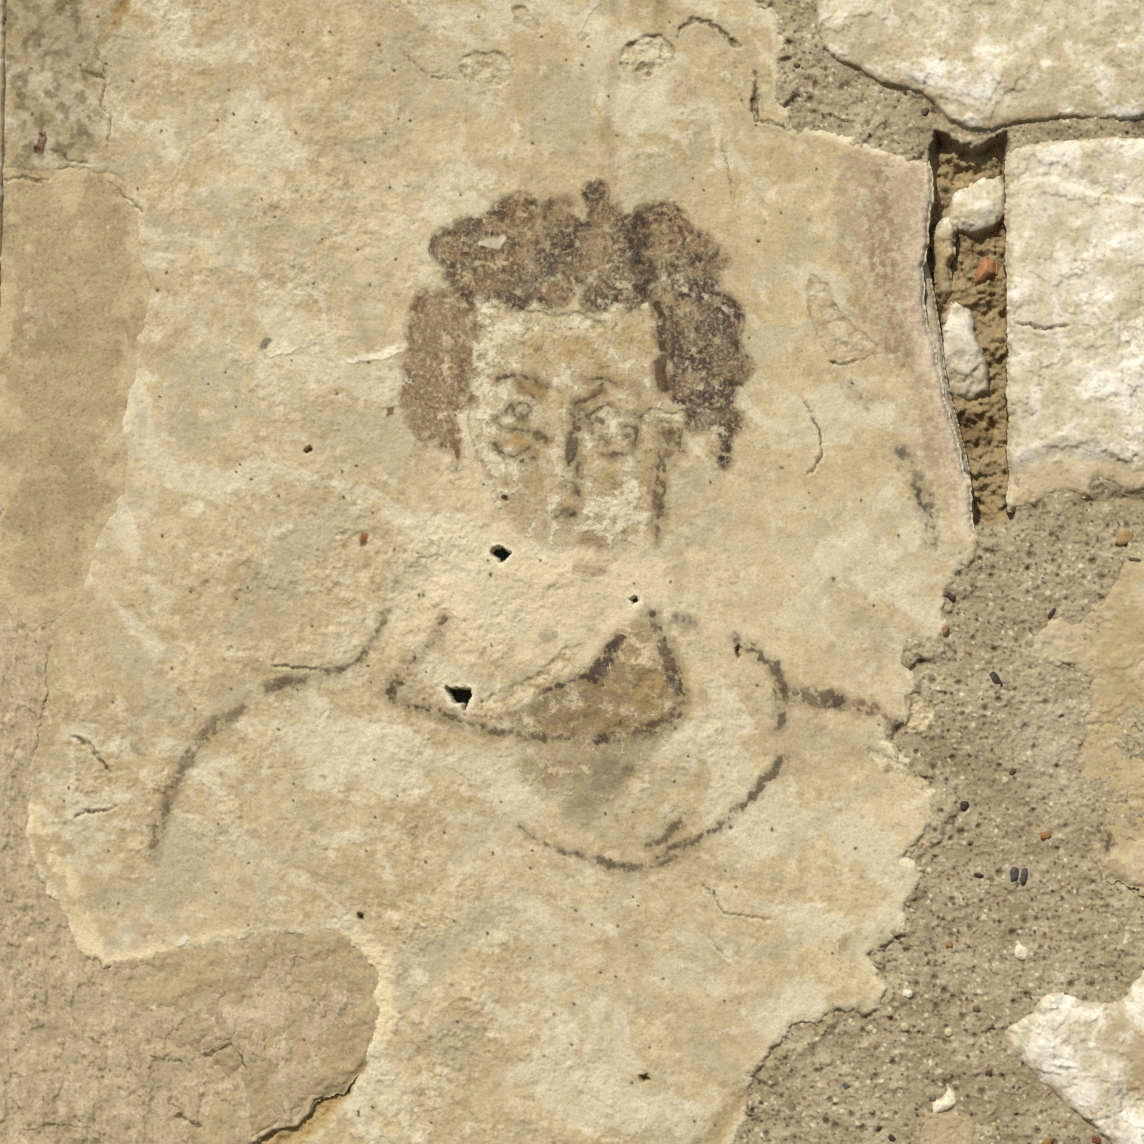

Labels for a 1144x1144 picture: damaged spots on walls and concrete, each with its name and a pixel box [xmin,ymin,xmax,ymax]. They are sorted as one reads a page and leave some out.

spalling [974,257,997,285]
spalling [807,275,877,361]
spalling [640,409,700,429]
spalling [905,692,936,735]
spalling [868,750,932,796]
flaking render [932,1086,956,1113]